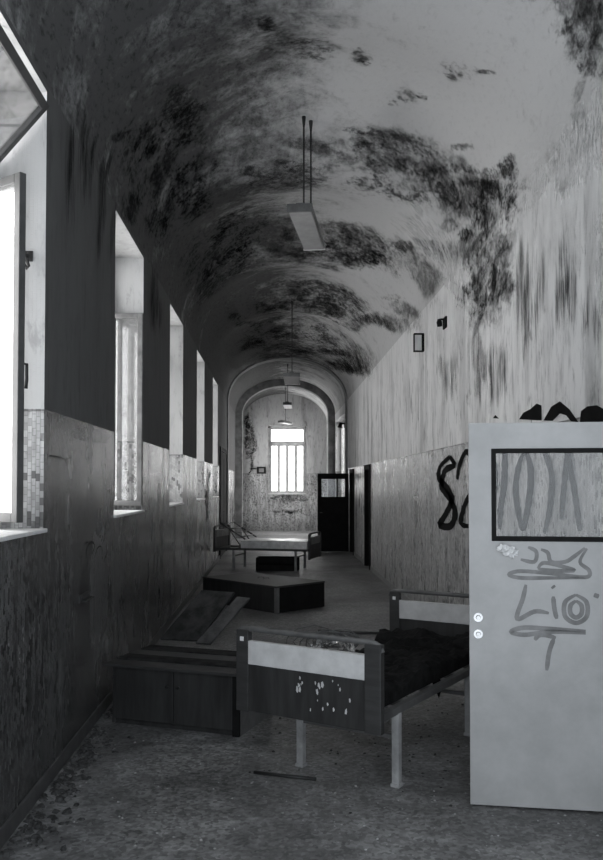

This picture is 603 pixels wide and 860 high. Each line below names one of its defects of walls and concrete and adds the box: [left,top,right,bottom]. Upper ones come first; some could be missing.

leakage [562,0,603,49]
leakage [122,85,218,244]
leakage [289,221,439,295]
leakage [344,130,538,341]
leakage [556,248,572,321]
leakage [229,280,414,375]
leakage [473,344,505,403]